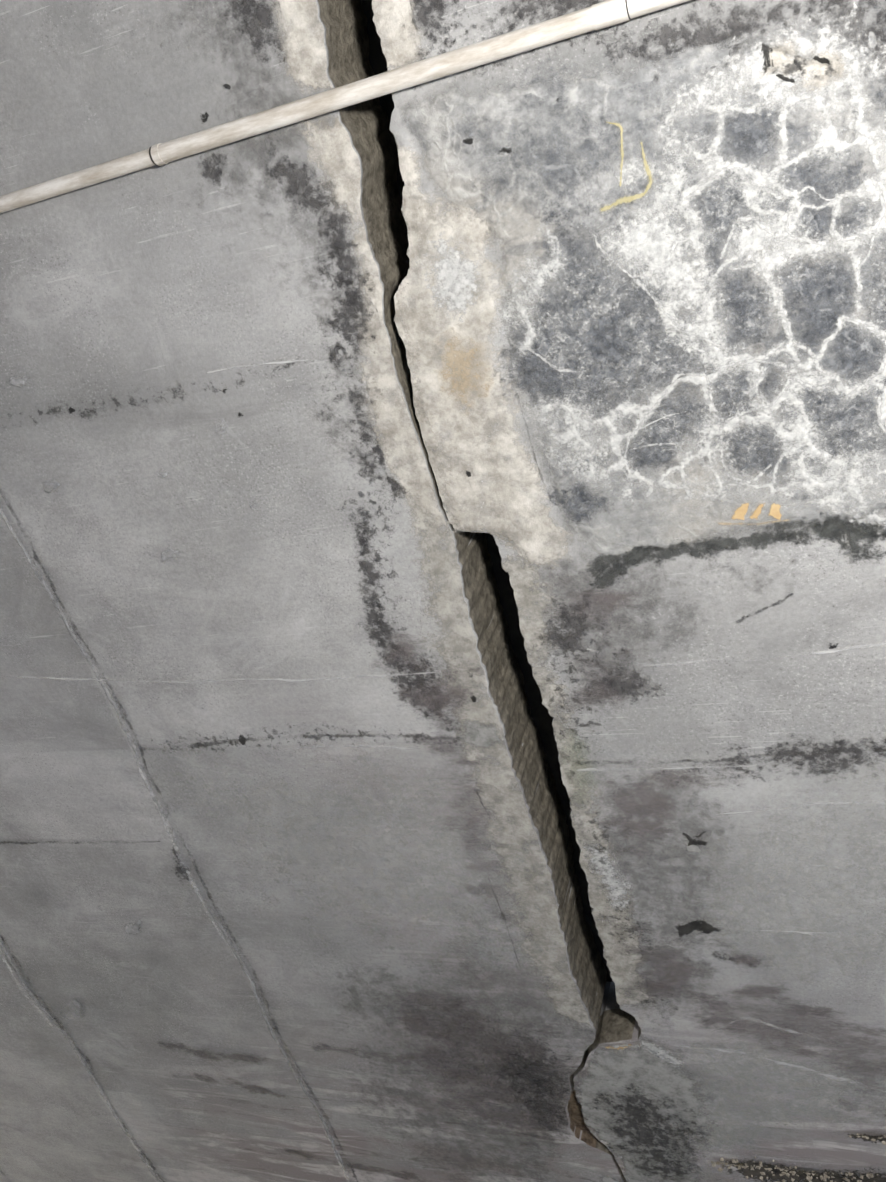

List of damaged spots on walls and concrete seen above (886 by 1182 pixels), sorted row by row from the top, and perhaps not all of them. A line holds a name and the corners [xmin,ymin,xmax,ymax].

leakage [202,154,226,185]
leakage [268,159,378,371]
crack [386,316,454,529]
leakage [464,0,886,774]
leakage [337,388,465,752]
crack [570,1008,623,1092]
crack [595,1139,627,1182]
spalling [711,1156,886,1182]
spalling [848,1134,886,1145]